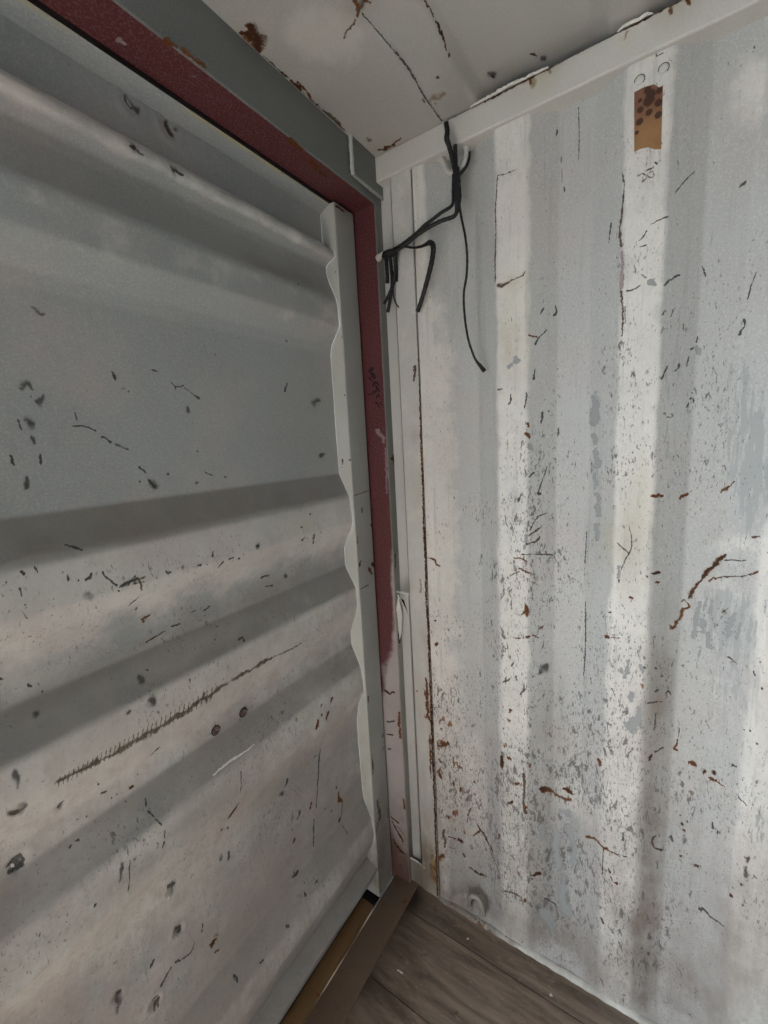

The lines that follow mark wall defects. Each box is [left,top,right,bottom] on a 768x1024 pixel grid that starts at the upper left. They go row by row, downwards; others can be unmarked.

corrosion [343,0,371,39]
corrosion [424,0,450,57]
peeling [618,12,653,32]
corrosion [238,22,345,131]
peeling [470,67,548,109]
corrosion [416,358,476,897]